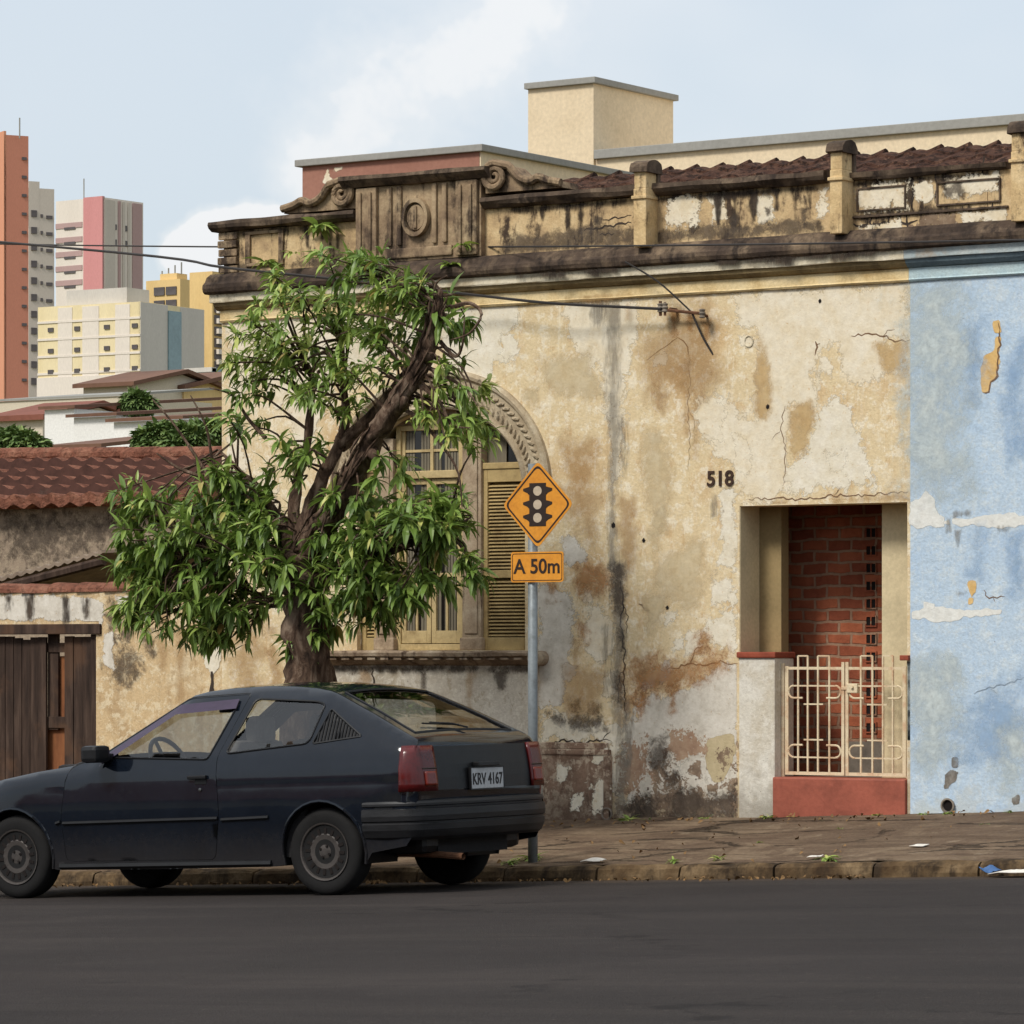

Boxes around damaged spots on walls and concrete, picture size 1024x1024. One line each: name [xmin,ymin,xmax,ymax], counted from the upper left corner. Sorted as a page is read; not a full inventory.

water stain [658,187,823,244]
peeling [853,170,1007,230]
crack [852,329,909,342]
spalling [980,320,1001,392]
crack [749,409,907,501]
peeling [538,282,910,819]
water stain [612,564,625,617]
peeling [0,593,128,671]